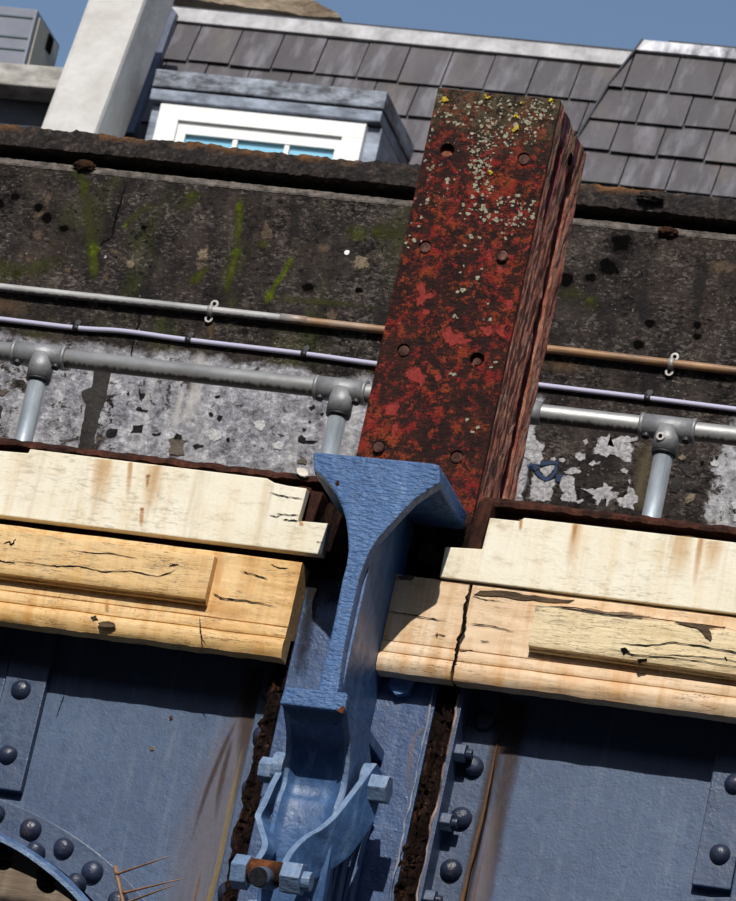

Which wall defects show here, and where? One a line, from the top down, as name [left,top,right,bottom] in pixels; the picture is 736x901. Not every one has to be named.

peeling [78,371,118,449]
spalling [131,412,230,456]
peeling [516,433,639,510]
peeling [670,454,719,504]
crack [390,585,514,675]
corrosion [242,668,264,760]
corrosion [202,736,230,803]
corrosion [462,697,526,901]
corrosion [207,783,236,901]